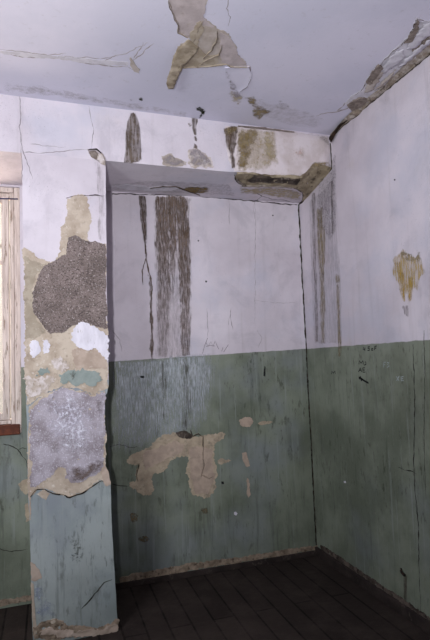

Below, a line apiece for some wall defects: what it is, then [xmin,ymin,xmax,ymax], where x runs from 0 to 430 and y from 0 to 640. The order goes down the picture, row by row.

crack [0,43,154,73]
peeling [166,0,252,97]
flaking render [330,17,430,135]
damp [124,113,141,163]
damp [224,126,275,168]
spalling [235,164,331,201]
crack [66,193,178,361]
damp [155,196,191,344]
damp [393,250,423,313]
flaking render [18,194,111,522]
peeling [239,417,272,427]
peeling [127,430,232,499]